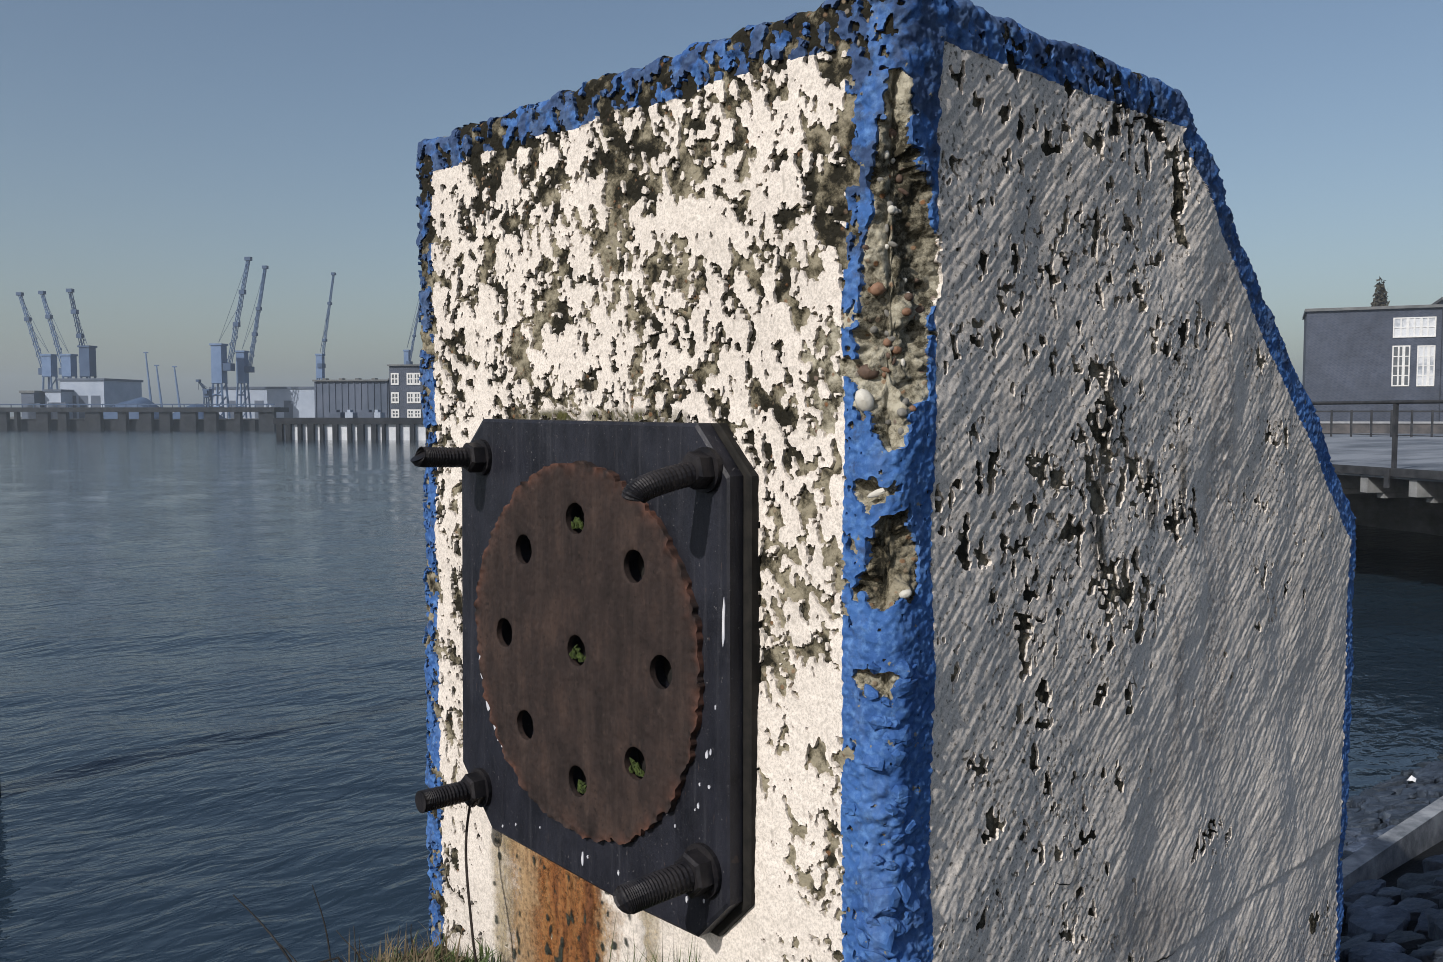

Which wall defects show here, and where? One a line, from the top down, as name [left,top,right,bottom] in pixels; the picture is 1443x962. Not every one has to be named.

peeling [1002,23,1089,98]
peeling [418,0,940,789]
peeling [430,805,482,942]
corrosion [493,832,656,962]
peeling [759,737,885,962]